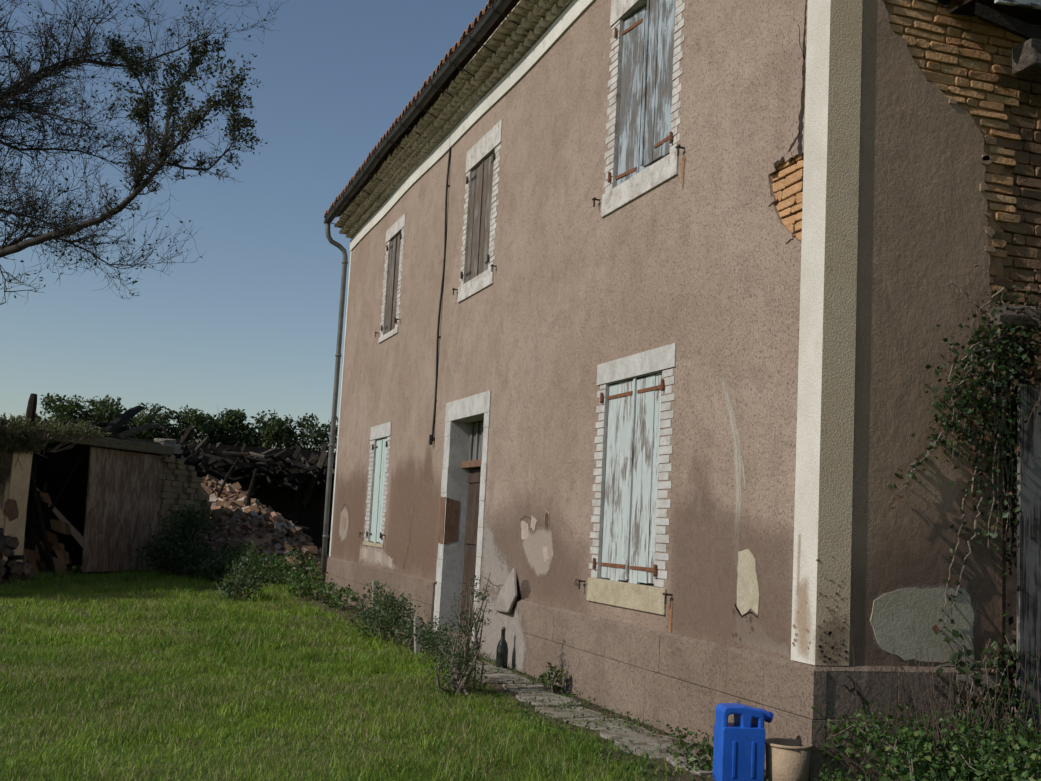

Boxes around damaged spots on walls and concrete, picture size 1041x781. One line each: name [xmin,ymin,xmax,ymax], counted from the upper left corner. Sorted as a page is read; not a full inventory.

spalling [767,151,804,243]
spalling [881,0,1027,312]
spalling [520,509,553,575]
peeling [732,549,849,664]